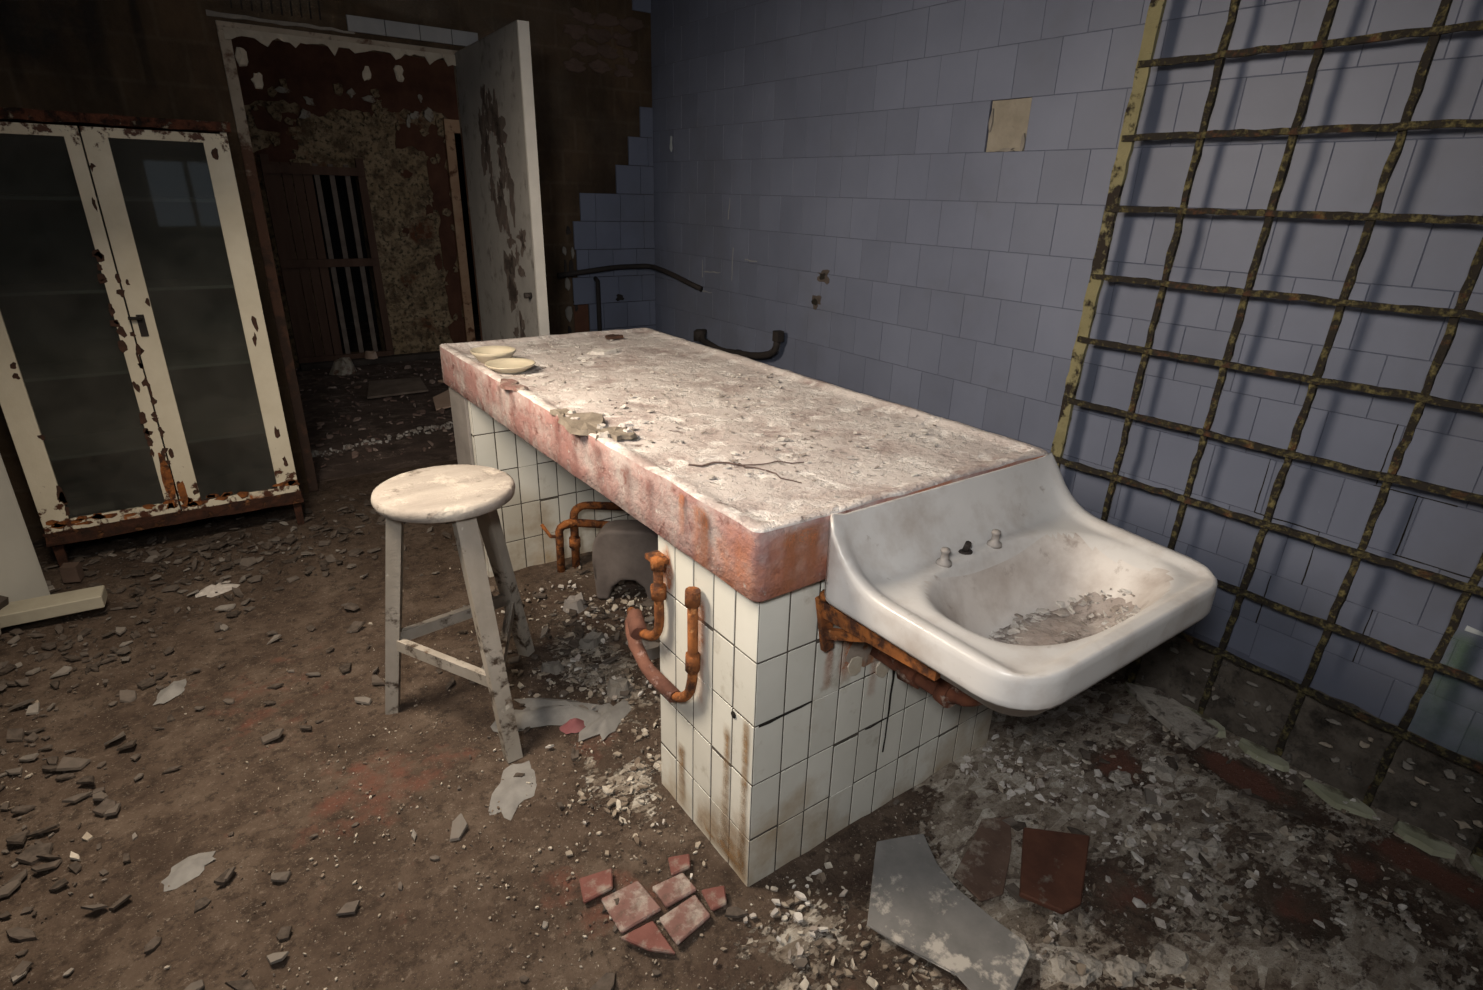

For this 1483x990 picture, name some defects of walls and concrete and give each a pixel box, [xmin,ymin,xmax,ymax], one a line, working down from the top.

peeling [223,27,473,349]
peeling [986,98,1032,152]